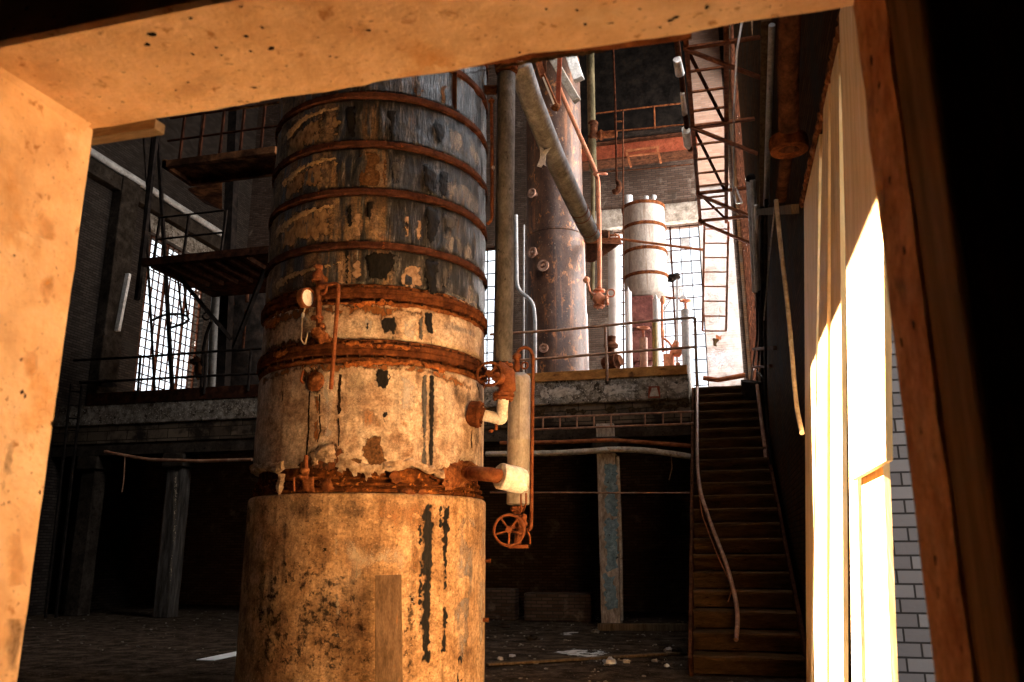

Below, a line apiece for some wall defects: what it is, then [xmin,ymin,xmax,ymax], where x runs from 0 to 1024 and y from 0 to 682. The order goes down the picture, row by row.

peeling [285,106,342,156]
peeling [354,213,373,236]
peeling [404,216,422,240]
peeling [276,252,422,289]
corrosion [258,337,485,472]
peeling [301,443,337,493]
peeling [351,436,387,465]
peeling [441,459,469,491]
peeling [602,463,620,610]
water stain [244,507,369,678]
water stain [403,504,485,682]